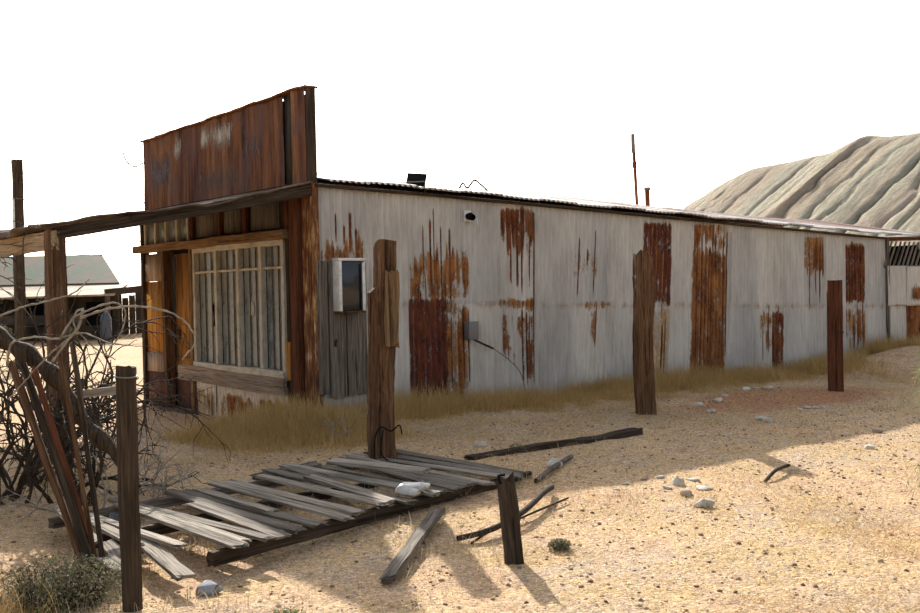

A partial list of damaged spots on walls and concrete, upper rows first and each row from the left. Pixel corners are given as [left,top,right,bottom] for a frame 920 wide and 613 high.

corrosion [143,88,307,211]
corrosion [409,209,470,399]
corrosion [498,206,535,383]
corrosion [643,222,672,376]
corrosion [689,224,728,375]
corrosion [760,307,784,370]
corrosion [804,235,824,310]
corrosion [845,241,865,349]